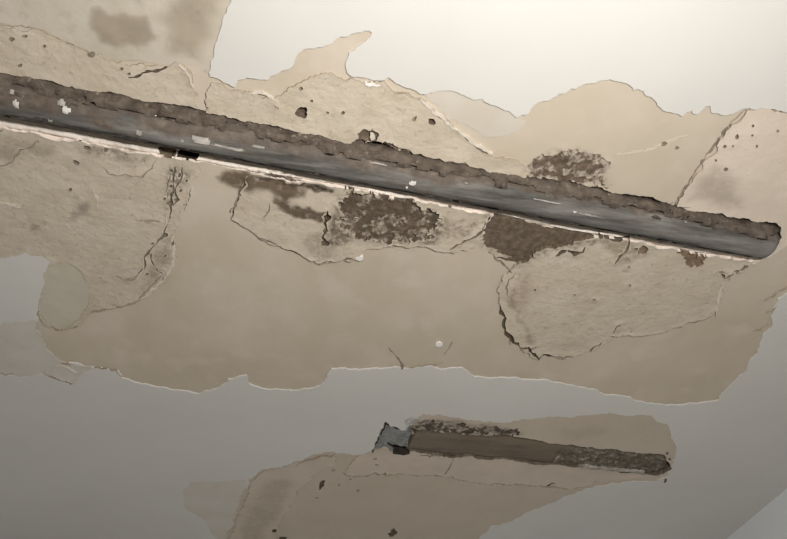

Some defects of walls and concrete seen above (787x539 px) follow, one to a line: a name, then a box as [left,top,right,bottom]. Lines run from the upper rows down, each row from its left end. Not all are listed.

crack [90,159,193,313]
rust [0,73,779,240]
peeling [0,0,787,404]
crack [450,216,570,360]
crack [556,232,631,264]
crack [590,245,787,352]
crack [670,109,747,208]
peeling [226,413,677,539]